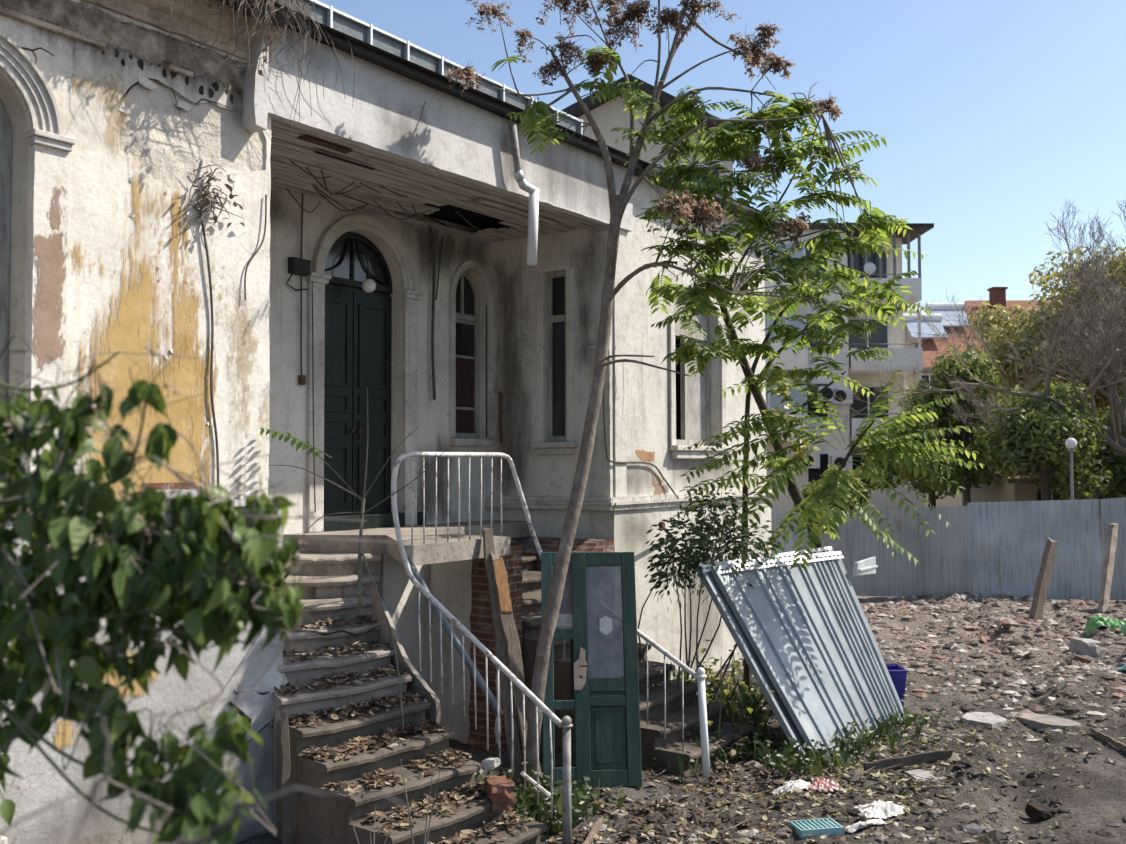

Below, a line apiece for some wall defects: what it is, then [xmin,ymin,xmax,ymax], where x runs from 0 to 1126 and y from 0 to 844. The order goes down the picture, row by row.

spalling [33,49,269,502]
spalling [635,449,669,495]